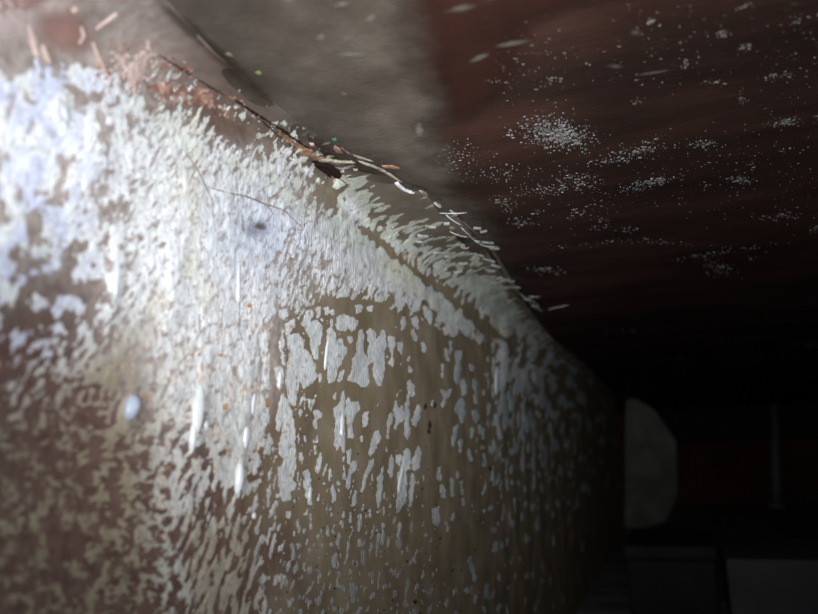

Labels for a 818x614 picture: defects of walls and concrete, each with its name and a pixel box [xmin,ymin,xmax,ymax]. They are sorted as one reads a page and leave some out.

crack [185,151,301,226]
crack [159,12,341,156]
peeling [94,35,618,614]
leakage [167,0,715,262]
crack [363,160,554,340]